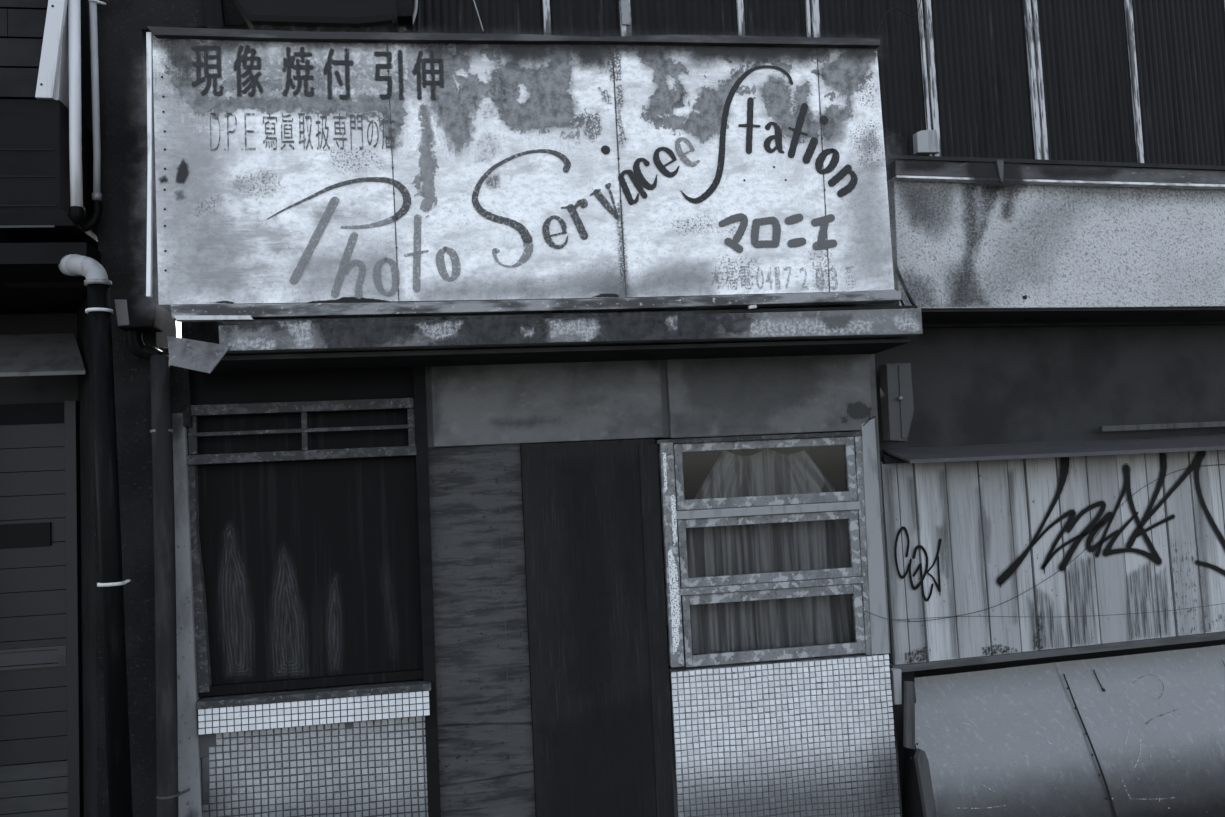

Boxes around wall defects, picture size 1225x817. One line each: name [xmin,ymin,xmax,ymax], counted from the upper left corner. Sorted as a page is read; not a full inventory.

leakage [903,184,1022,307]
leakage [905,647,927,663]